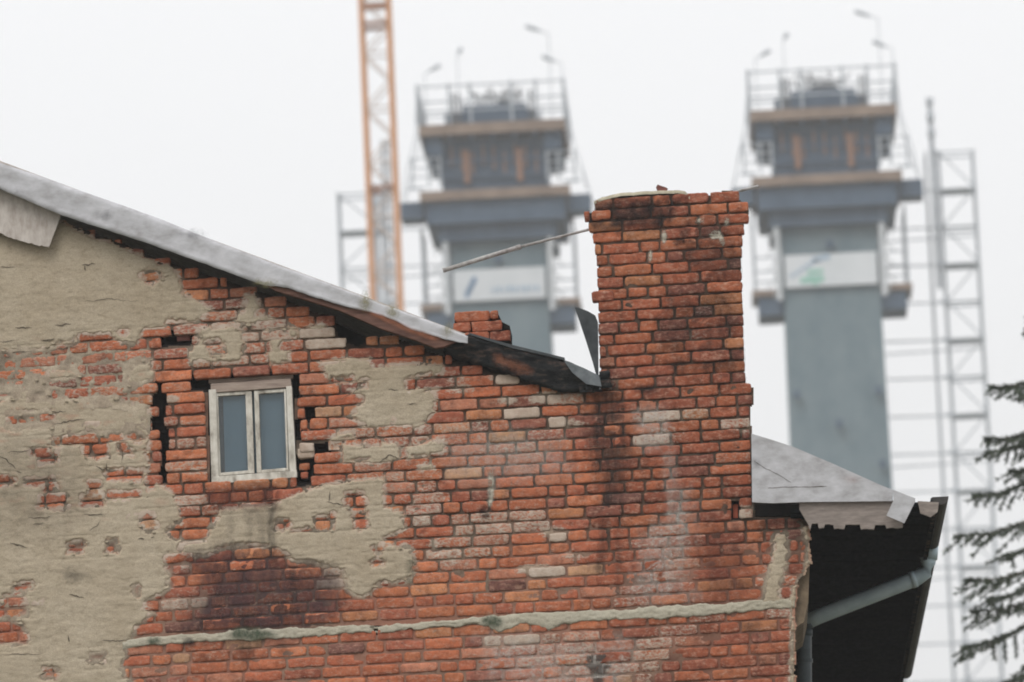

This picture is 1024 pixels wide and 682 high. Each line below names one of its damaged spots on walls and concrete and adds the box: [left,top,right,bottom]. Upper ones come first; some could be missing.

crack [150,375,197,483]
flaking render [0,222,447,682]
damp [200,556,336,630]
flaking render [763,526,812,682]